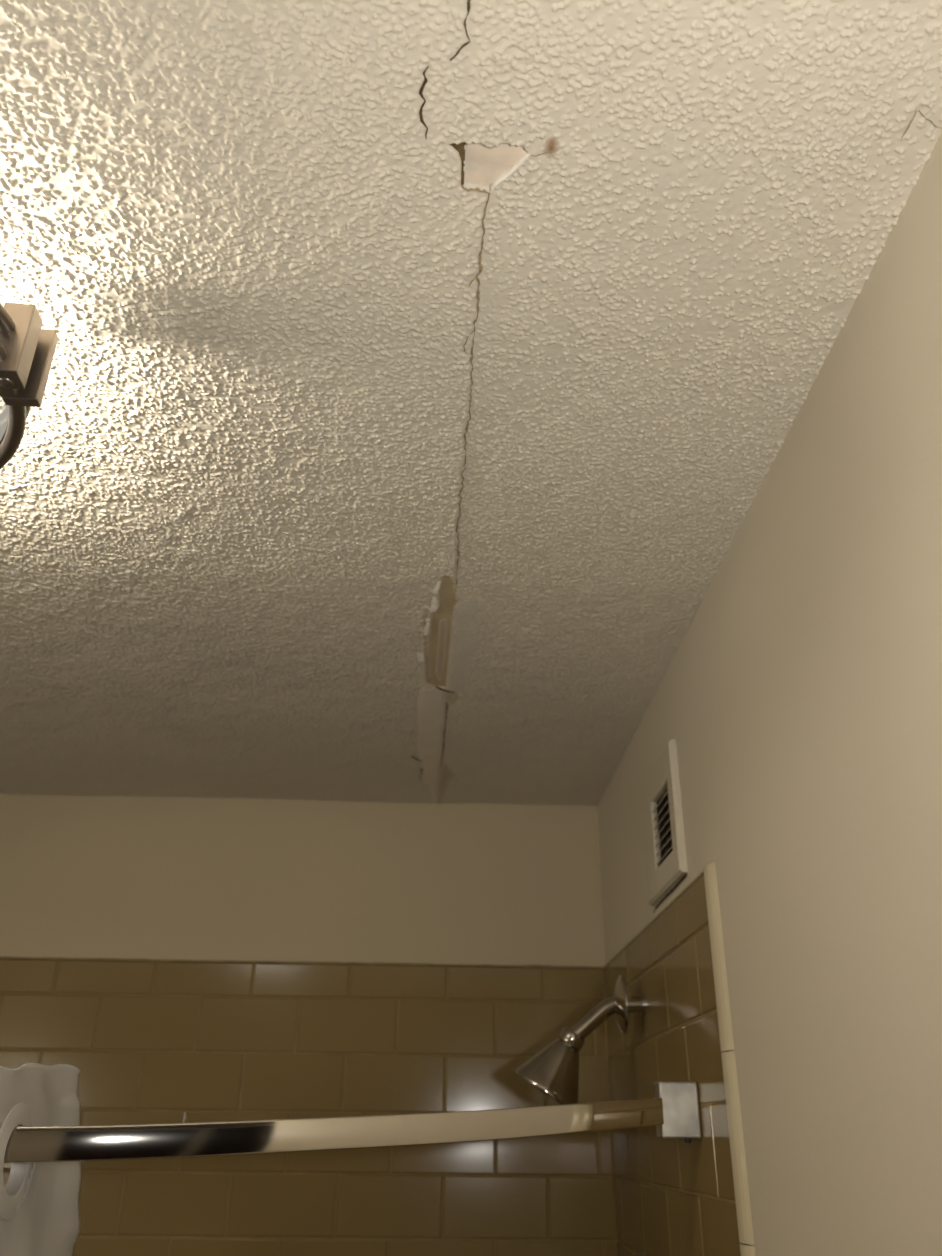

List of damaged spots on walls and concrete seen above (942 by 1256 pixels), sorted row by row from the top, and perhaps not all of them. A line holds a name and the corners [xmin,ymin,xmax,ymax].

crack [419,0,471,139]
spalling [449,142,531,194]
crack [456,194,490,584]